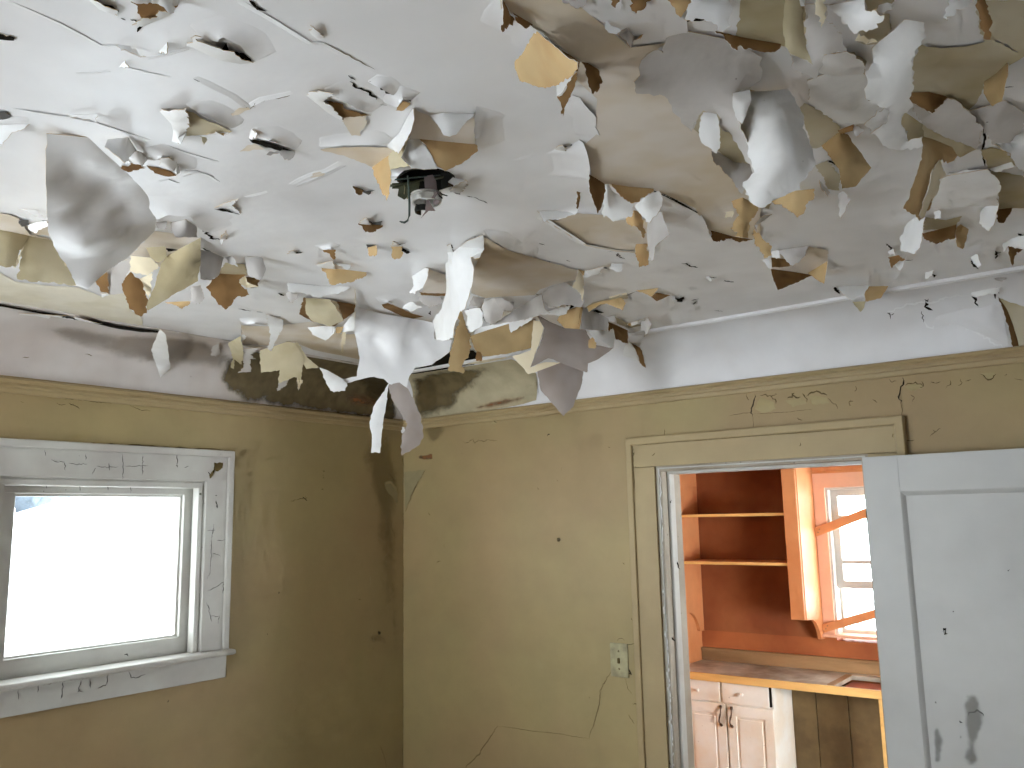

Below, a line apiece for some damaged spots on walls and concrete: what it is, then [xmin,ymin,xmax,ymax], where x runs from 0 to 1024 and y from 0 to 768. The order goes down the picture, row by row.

peeling [160,99,250,144]
peeling [319,86,506,200]
peeling [480,0,1024,312]
peeling [0,133,266,326]
water stain [222,352,395,419]
peeling [210,229,670,511]
water stain [408,359,550,418]
crack [730,395,811,425]
crack [45,452,145,493]
crack [207,525,224,621]
crack [18,654,145,699]
crack [466,670,634,767]